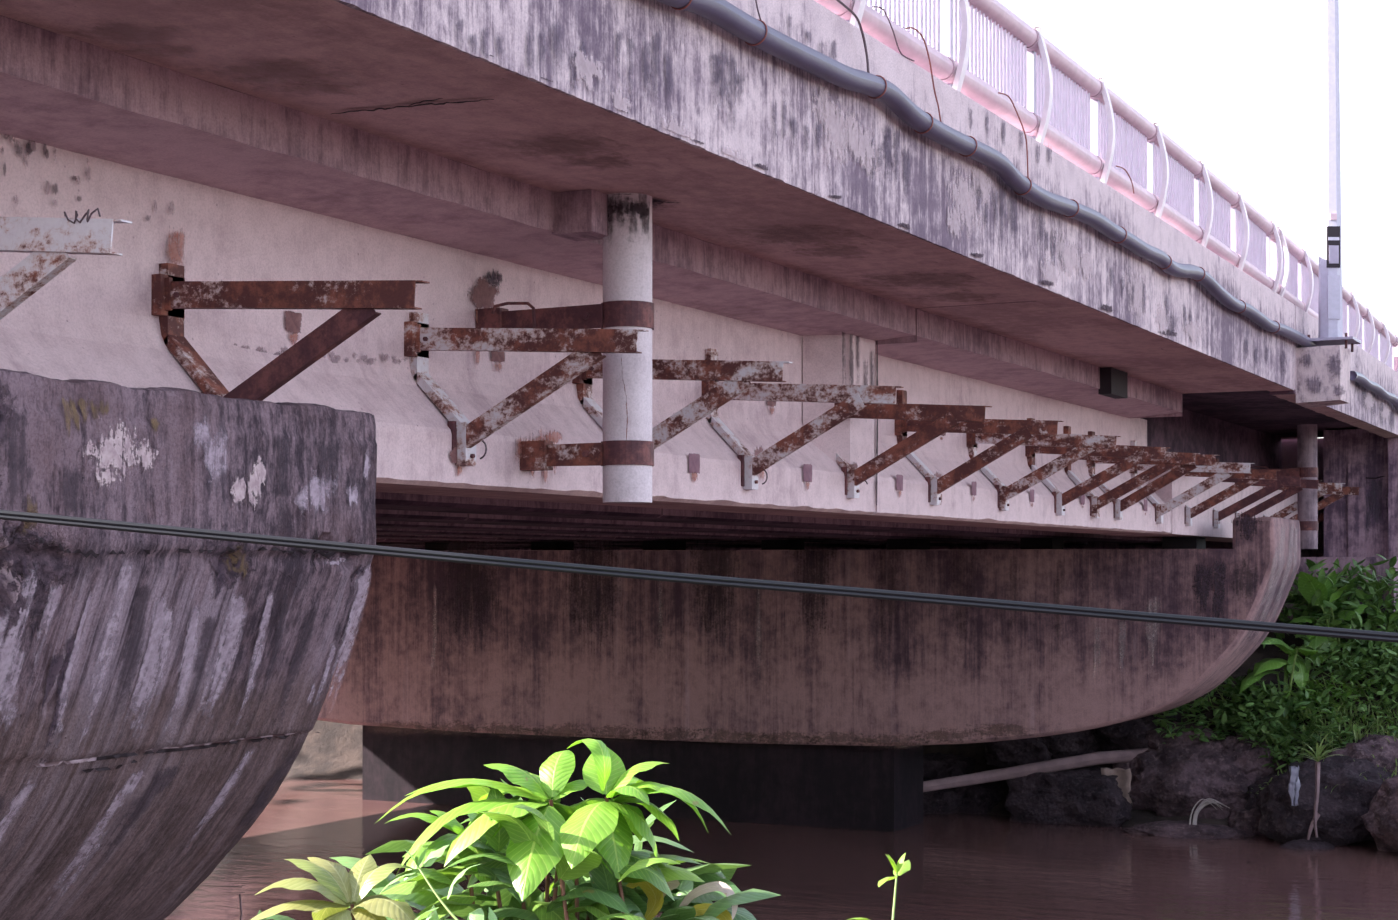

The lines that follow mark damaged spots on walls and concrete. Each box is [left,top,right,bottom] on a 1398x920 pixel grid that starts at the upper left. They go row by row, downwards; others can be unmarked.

damp [607,193,679,234]
corrosion [285,311,302,344]
corrosion [467,269,502,324]
corrosion [476,351,505,371]
peeling [83,422,159,486]
corrosion [689,453,700,481]
corrosion [803,464,812,490]
spalling [0,499,74,636]
damp [0,572,62,725]
damp [91,566,317,728]
damp [307,566,370,702]
damp [59,767,177,896]